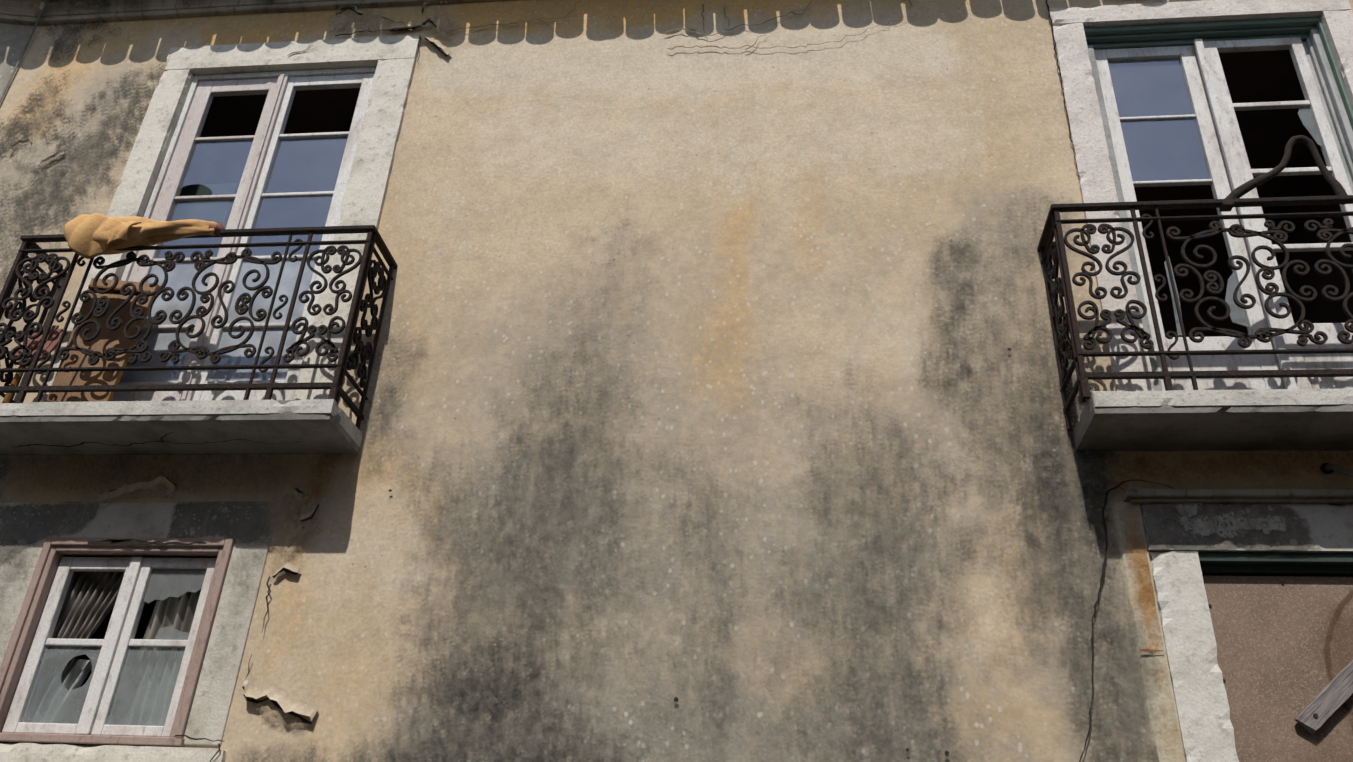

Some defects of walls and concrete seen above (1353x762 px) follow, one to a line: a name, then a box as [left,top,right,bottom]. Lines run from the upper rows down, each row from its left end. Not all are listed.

water stain [0,0,165,305]
flaking render [330,1,454,62]
crack [664,0,914,50]
crack [1045,0,1079,177]
crack [12,432,300,448]
flaking render [242,654,318,726]
flaking render [262,486,321,631]
water stain [385,422,624,762]
crack [1079,480,1175,762]
peeling [1174,503,1287,541]